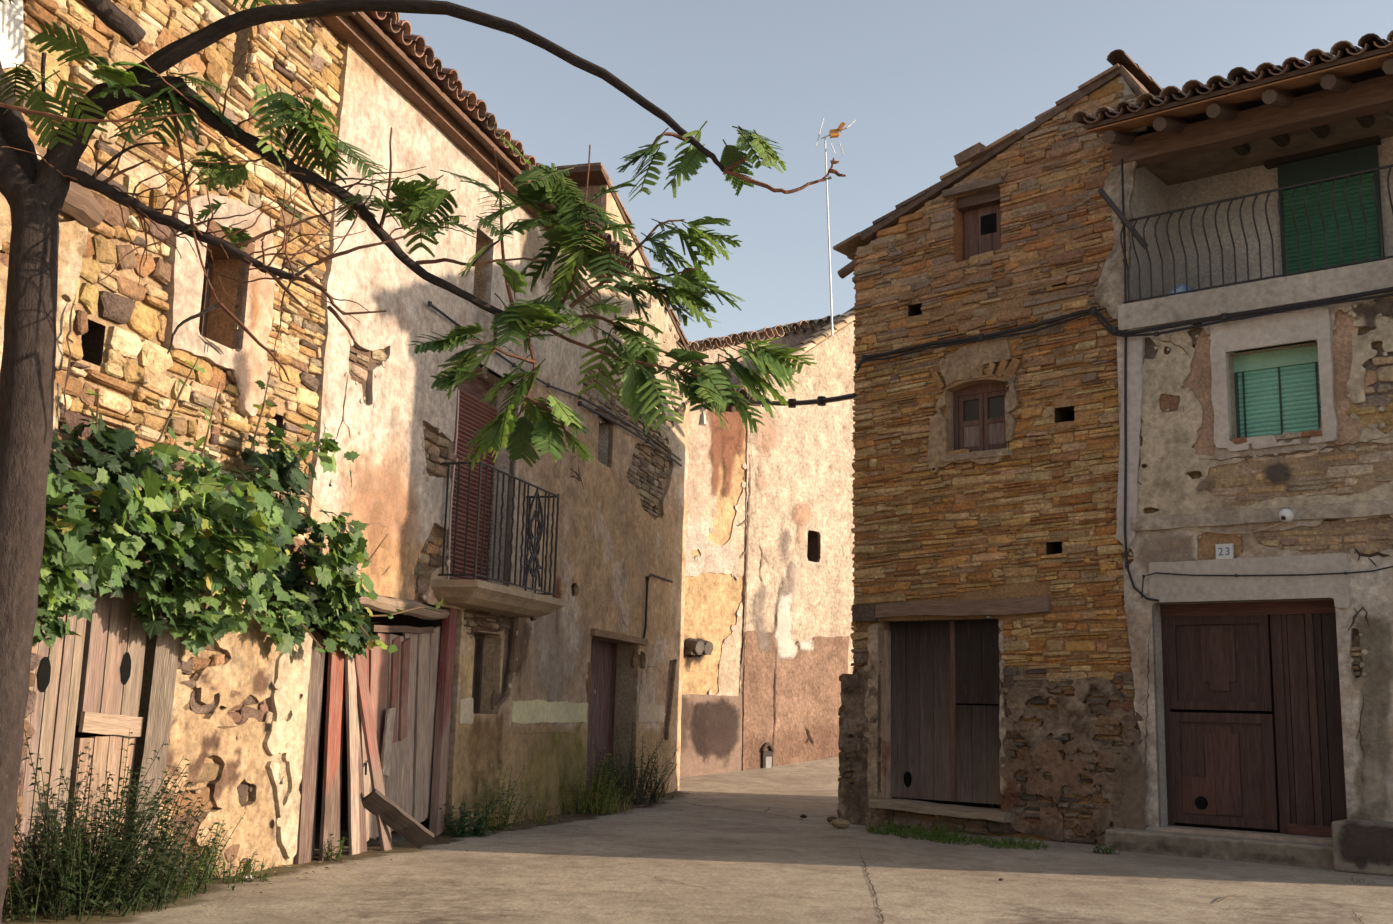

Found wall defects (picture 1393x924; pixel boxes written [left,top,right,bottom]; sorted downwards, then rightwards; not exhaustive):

flaking render [580,365,675,521]
flaking render [1144,338,1171,359]
flaking render [1154,292,1393,507]
peeling [263,632,313,859]
damp [681,697,739,759]